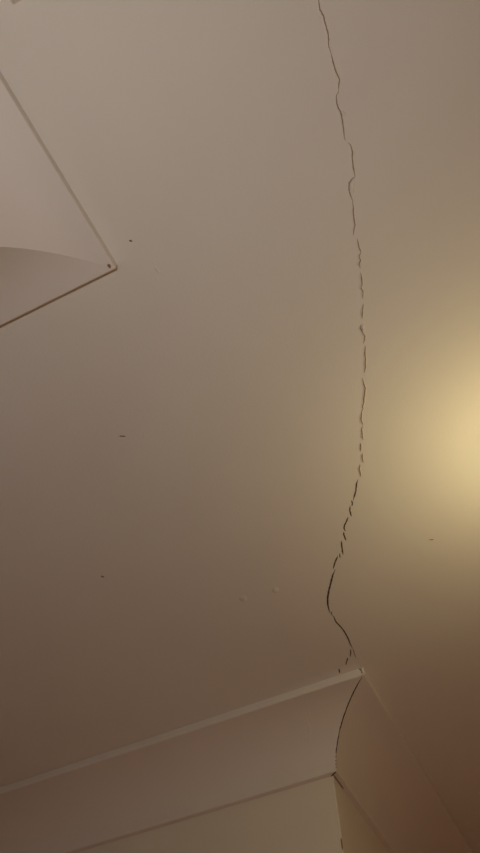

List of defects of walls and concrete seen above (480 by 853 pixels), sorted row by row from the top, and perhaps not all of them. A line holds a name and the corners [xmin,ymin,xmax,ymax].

crack [317,0,367,789]